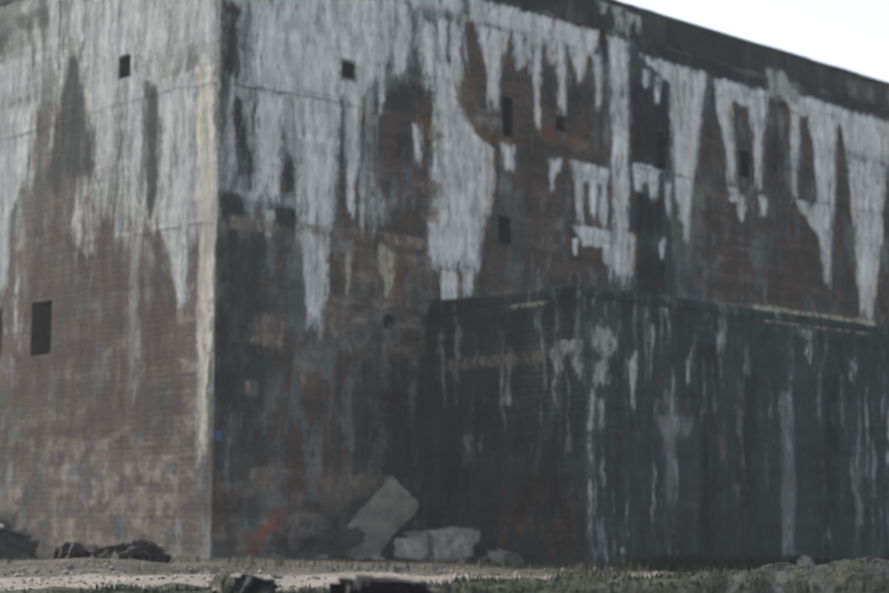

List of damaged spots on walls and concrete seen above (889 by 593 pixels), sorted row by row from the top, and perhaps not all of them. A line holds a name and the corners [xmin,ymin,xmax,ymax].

water stain [0,33,42,300]
water stain [18,0,889,469]